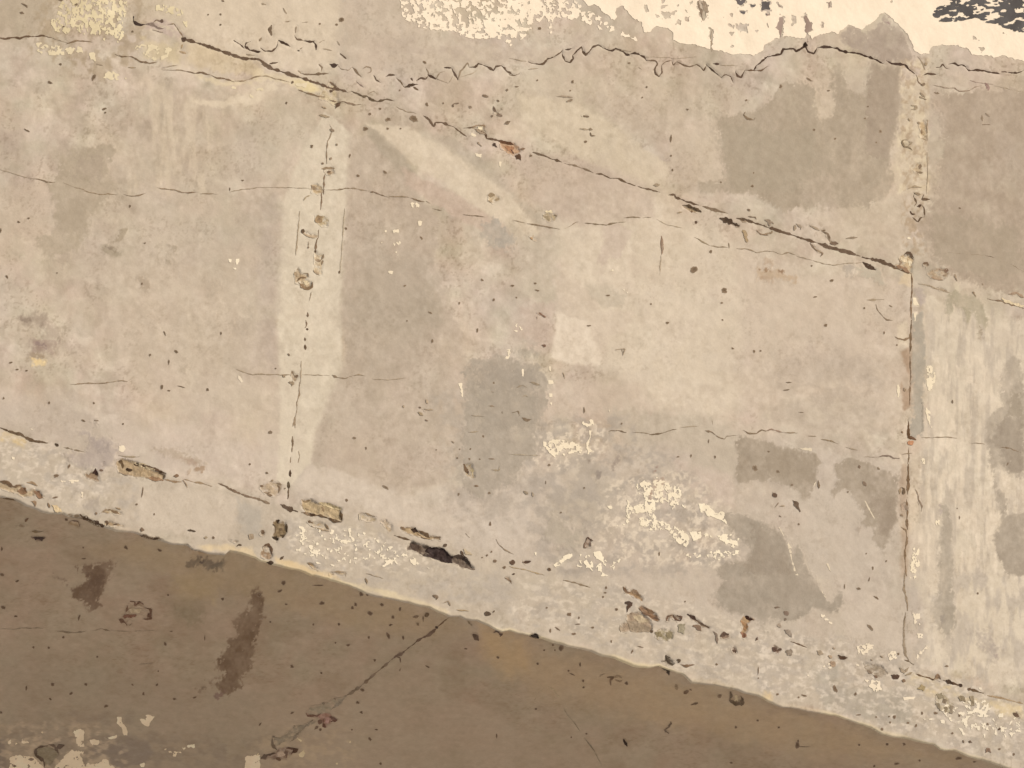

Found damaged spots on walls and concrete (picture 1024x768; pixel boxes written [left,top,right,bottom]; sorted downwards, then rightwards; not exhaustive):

crack [0,1,1024,106]
peeling [400,0,1024,66]
water stain [694,13,916,217]
crack [0,169,483,217]
crack [515,216,862,271]
crack [610,421,953,459]
spalling [228,498,536,586]
peeling [617,477,739,560]
water stain [710,511,847,637]
water stain [731,433,903,552]
water stain [194,585,268,707]
spalling [611,585,758,654]